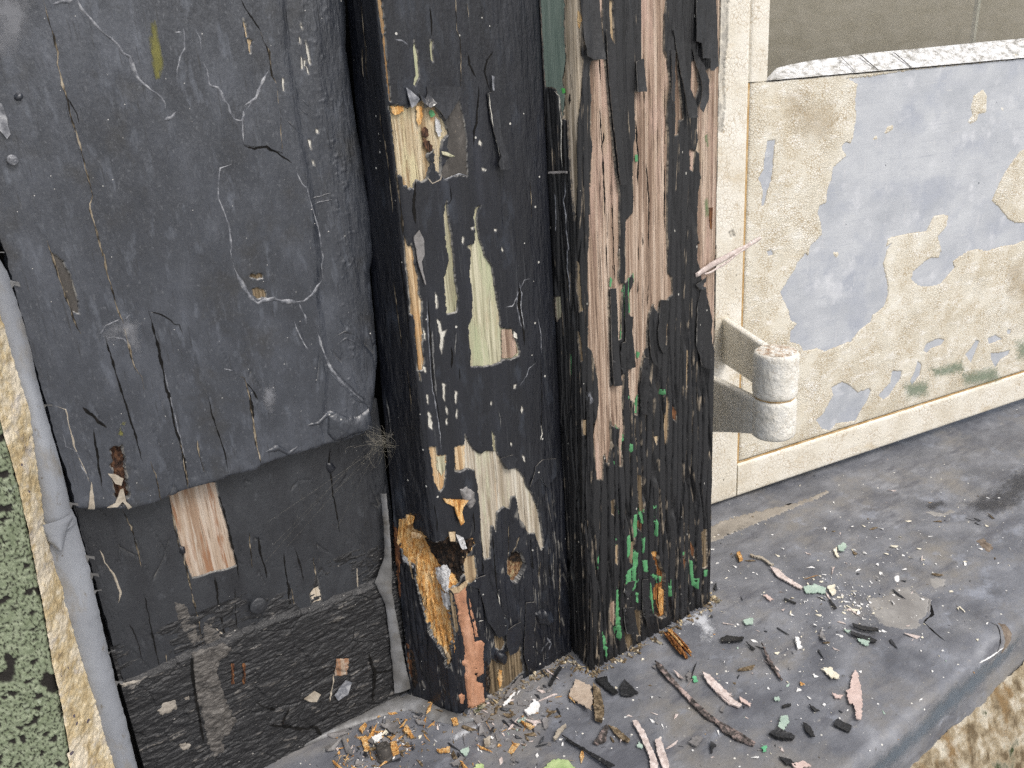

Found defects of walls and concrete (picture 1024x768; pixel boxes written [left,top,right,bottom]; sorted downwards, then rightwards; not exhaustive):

crack [242,2,283,154]
crack [45,7,229,499]
peeling [378,0,518,380]
peeling [541,0,720,479]
peeling [758,140,775,206]
peeling [780,59,1024,352]
peeling [816,338,944,431]
peeling [157,482,239,757]
peeling [429,434,557,583]
peeling [485,636,523,707]
peeling [615,475,644,564]
peeling [683,529,707,567]